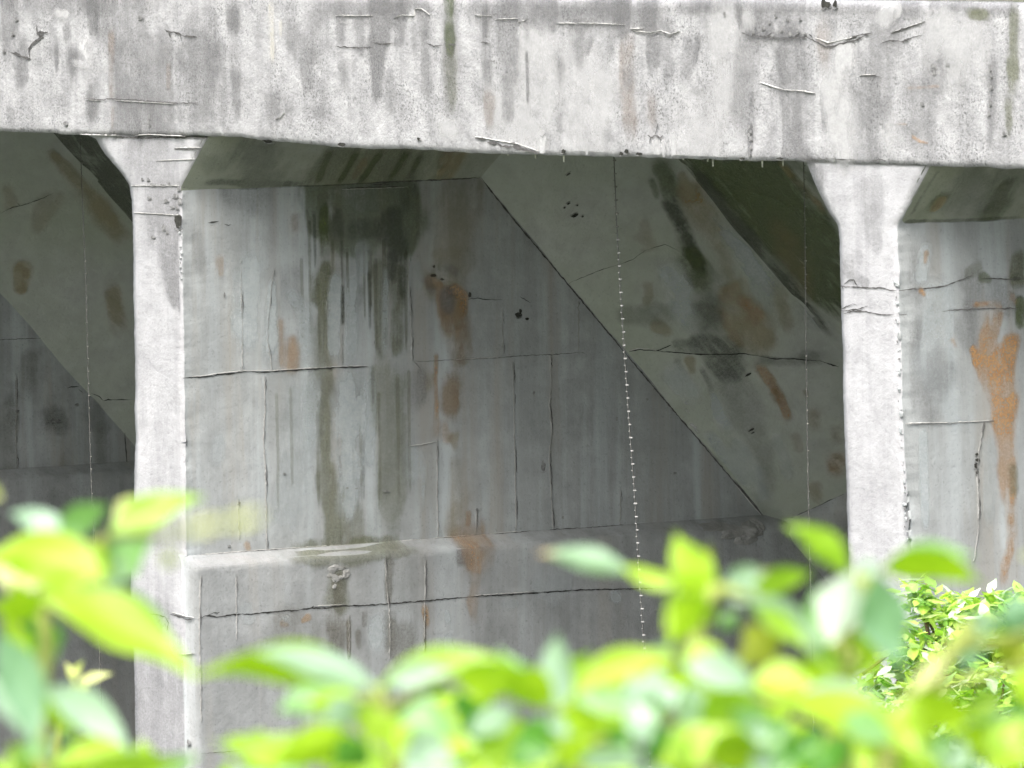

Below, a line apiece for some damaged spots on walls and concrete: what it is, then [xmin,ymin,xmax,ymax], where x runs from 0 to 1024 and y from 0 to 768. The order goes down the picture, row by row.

spalling [741,14,807,40]
water stain [654,35,841,314]
crack [186,365,364,378]
water stain [312,263,344,351]
crack [299,178,838,515]
crack [840,276,1023,315]
rust [970,318,1018,440]
crack [161,588,650,629]